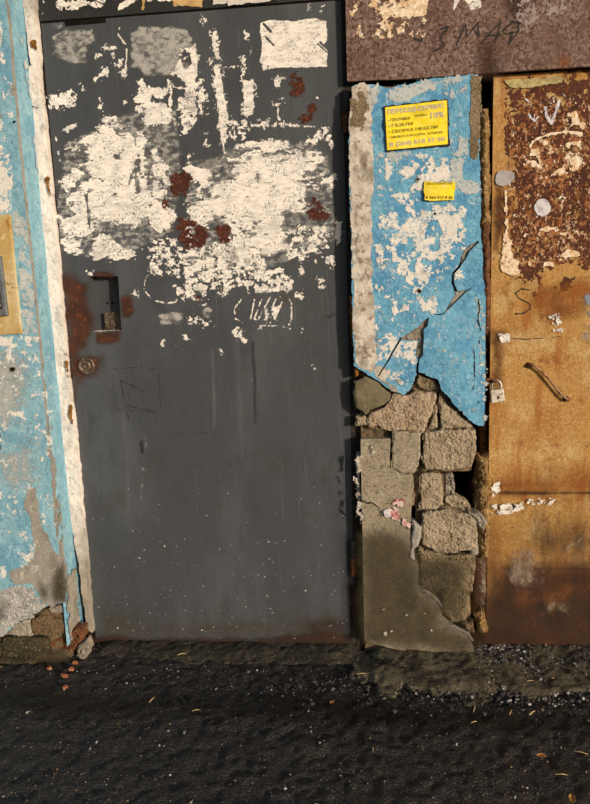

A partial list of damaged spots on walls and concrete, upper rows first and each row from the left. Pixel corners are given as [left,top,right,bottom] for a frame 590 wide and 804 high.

rust [162,171,193,210]
rust [176,217,232,250]
rust [306,197,331,223]
crack [452,241,478,292]
rust [495,95,590,266]
spalling [0,110,94,659]
rust [62,276,119,379]
crack [378,337,402,376]
peeling [348,74,488,641]
crack [473,299,481,390]
peeling [491,479,556,515]
rust [483,561,590,646]